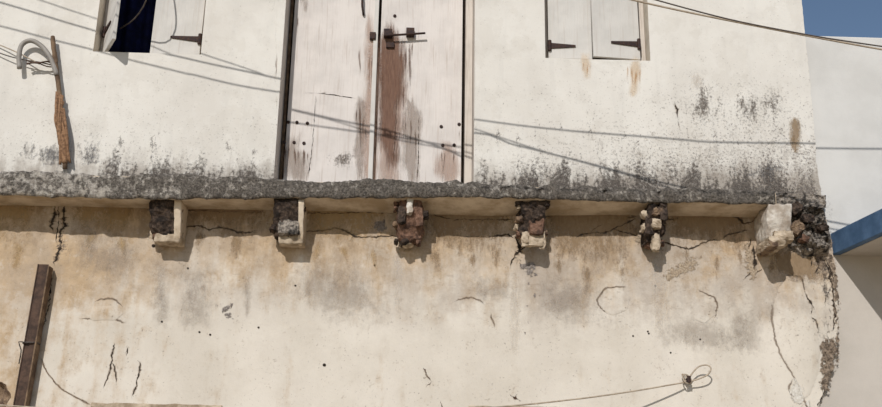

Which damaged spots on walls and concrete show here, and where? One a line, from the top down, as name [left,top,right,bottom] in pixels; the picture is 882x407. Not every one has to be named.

water stain [476,160,816,194]
crack [44,206,67,324]
crack [187,210,253,236]
crack [308,212,397,238]
crack [577,216,636,237]
crack [665,217,762,278]
spalling [787,197,841,397]
crack [795,258,836,331]
spalling [0,382,11,407]
crack [104,344,141,397]